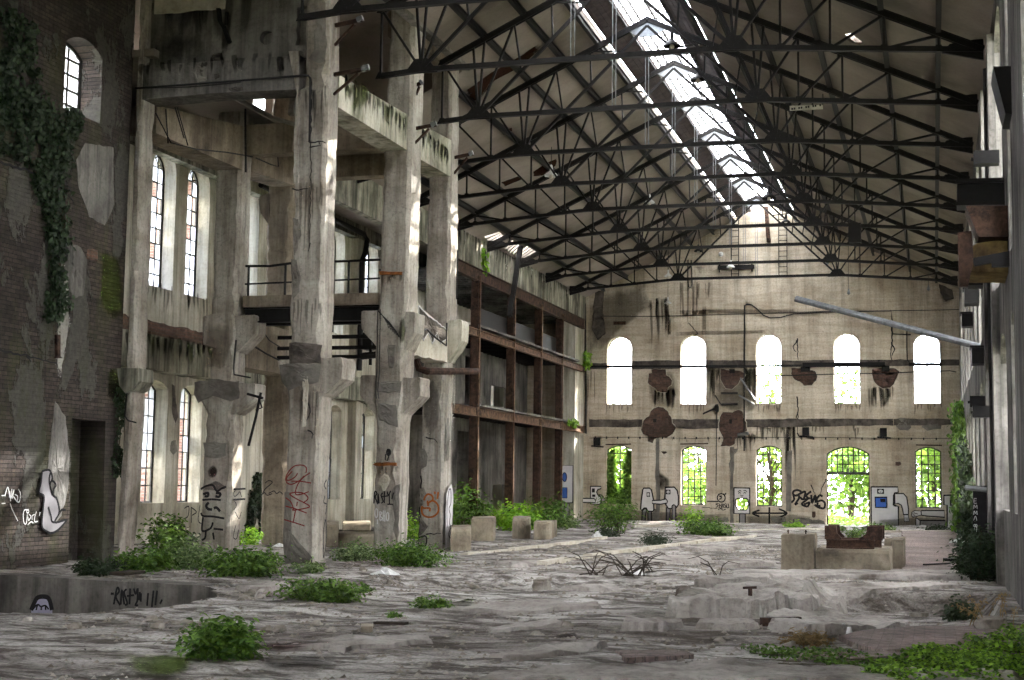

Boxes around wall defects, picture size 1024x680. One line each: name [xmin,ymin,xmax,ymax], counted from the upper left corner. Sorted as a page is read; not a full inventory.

water stain [346,75,406,133]
flaking render [76,143,114,225]
flaking render [65,244,98,298]
water stain [592,283,780,342]
flaking render [48,402,70,521]